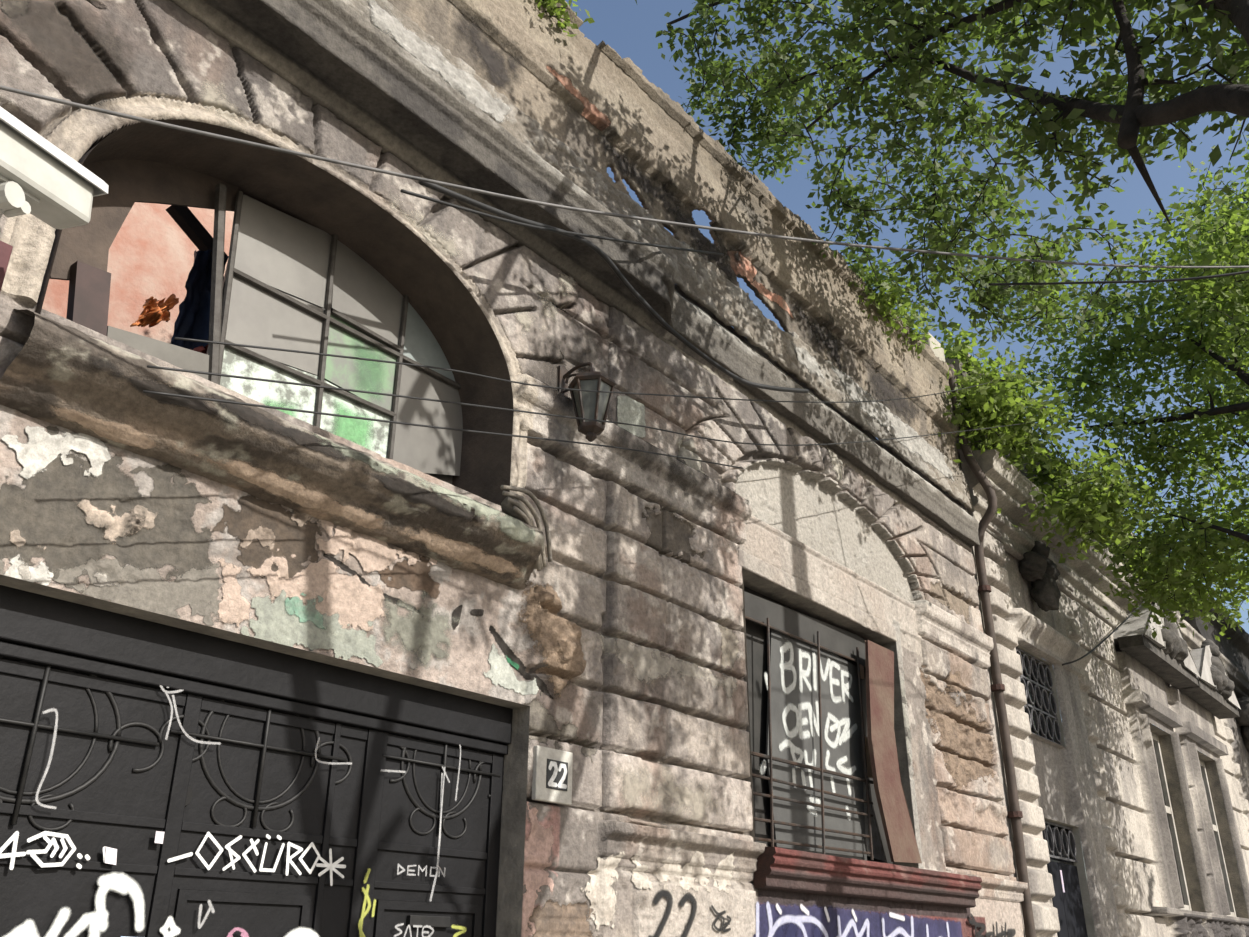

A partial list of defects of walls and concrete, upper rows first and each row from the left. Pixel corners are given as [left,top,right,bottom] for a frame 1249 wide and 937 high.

water stain [458,22,522,88]
flaking render [546,66,611,131]
water stain [597,125,742,281]
flaking render [728,250,794,319]
water stain [795,303,843,371]
water stain [860,350,920,423]
flaking render [0,407,524,632]
peeling [528,851,735,937]